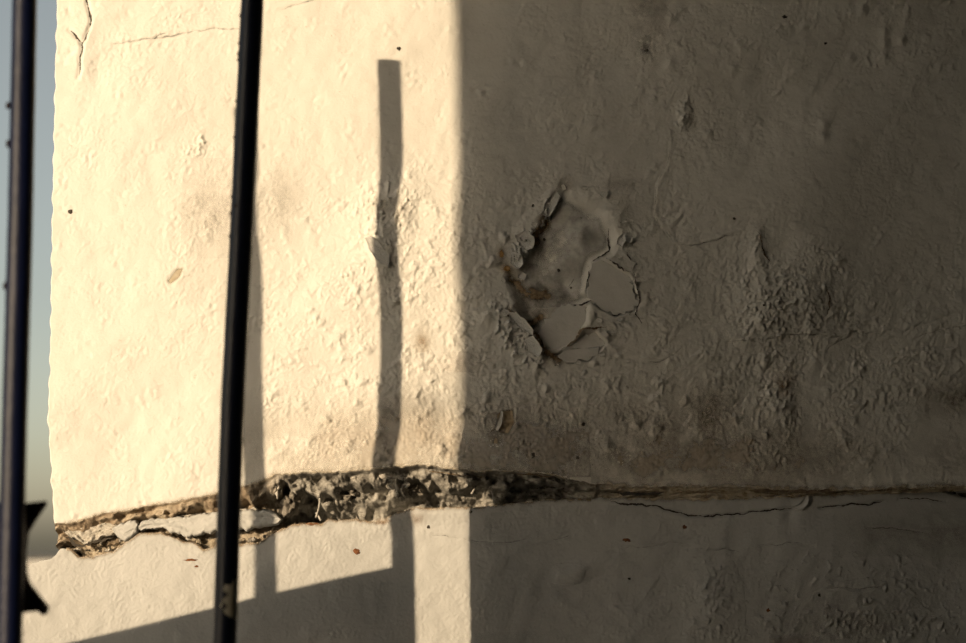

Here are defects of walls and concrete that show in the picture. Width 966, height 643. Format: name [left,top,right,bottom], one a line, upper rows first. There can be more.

crack [71,0,92,74]
peeling [489,184,642,368]
crack [55,492,217,559]
crack [240,464,966,546]